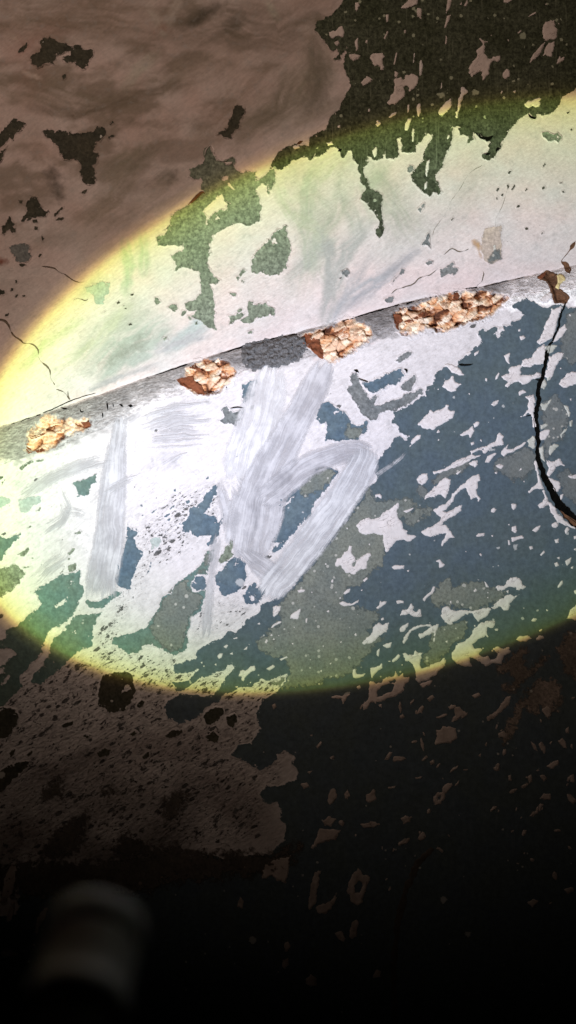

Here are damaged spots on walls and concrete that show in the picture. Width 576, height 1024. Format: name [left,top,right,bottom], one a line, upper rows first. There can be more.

peeling [0,224,576,1024]
peeling [153,0,576,428]
crack [525,303,576,528]